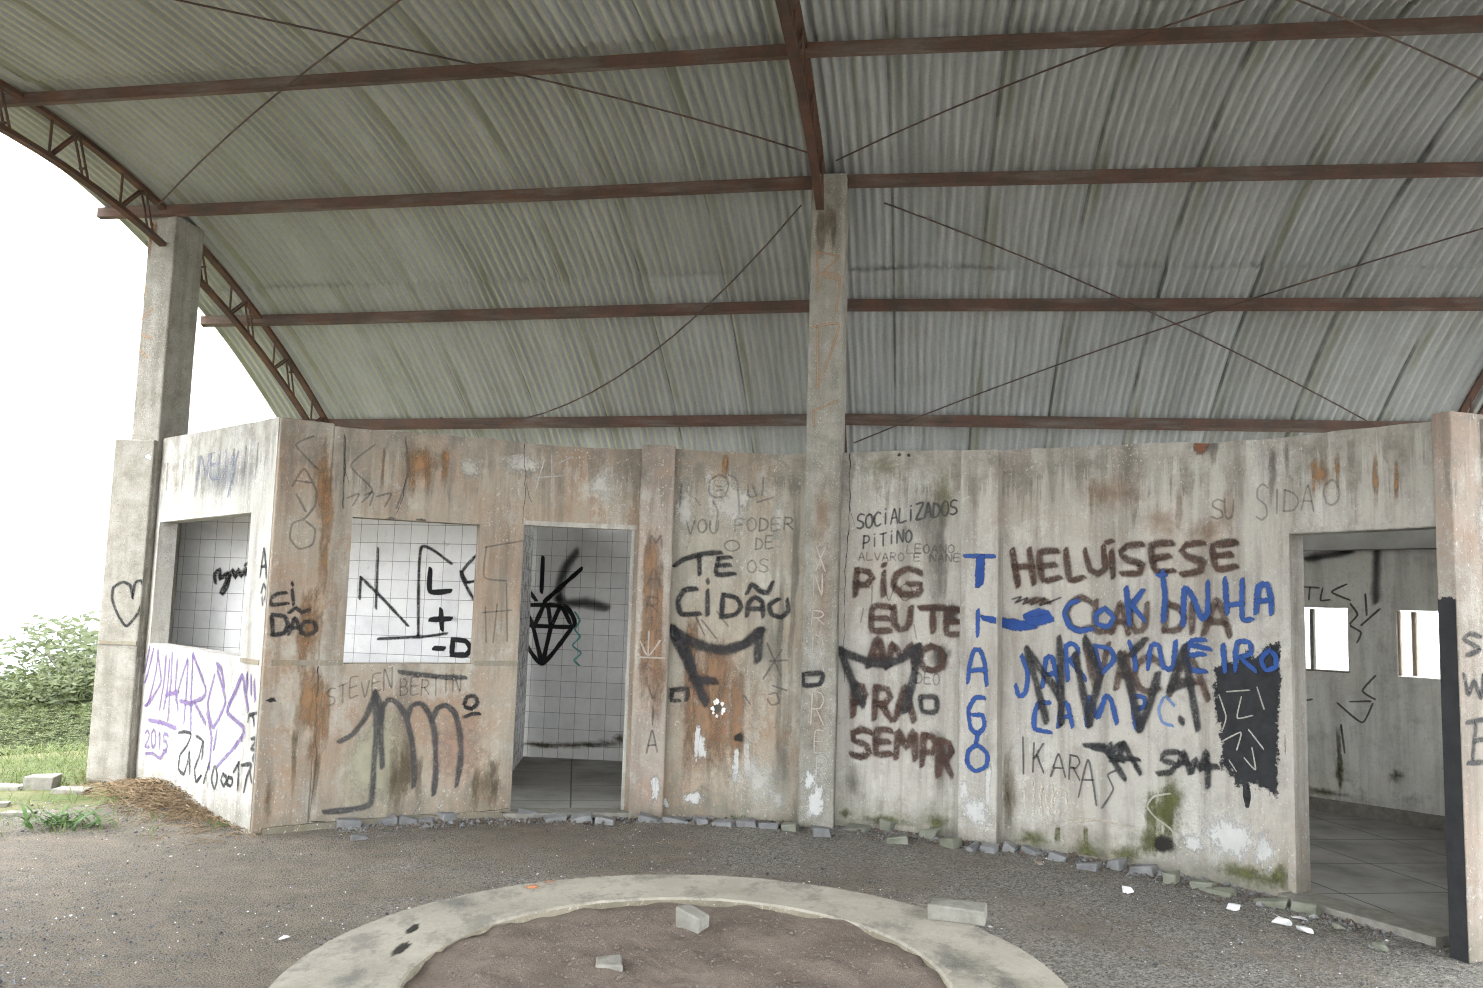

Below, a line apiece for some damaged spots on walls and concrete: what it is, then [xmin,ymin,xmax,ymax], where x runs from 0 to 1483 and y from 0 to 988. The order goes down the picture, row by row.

corrosion [408,450,449,488]
corrosion [1311,459,1339,492]
corrosion [1372,458,1398,495]
corrosion [316,457,333,588]
corrosion [297,599,330,761]
water stain [1078,785,1180,861]